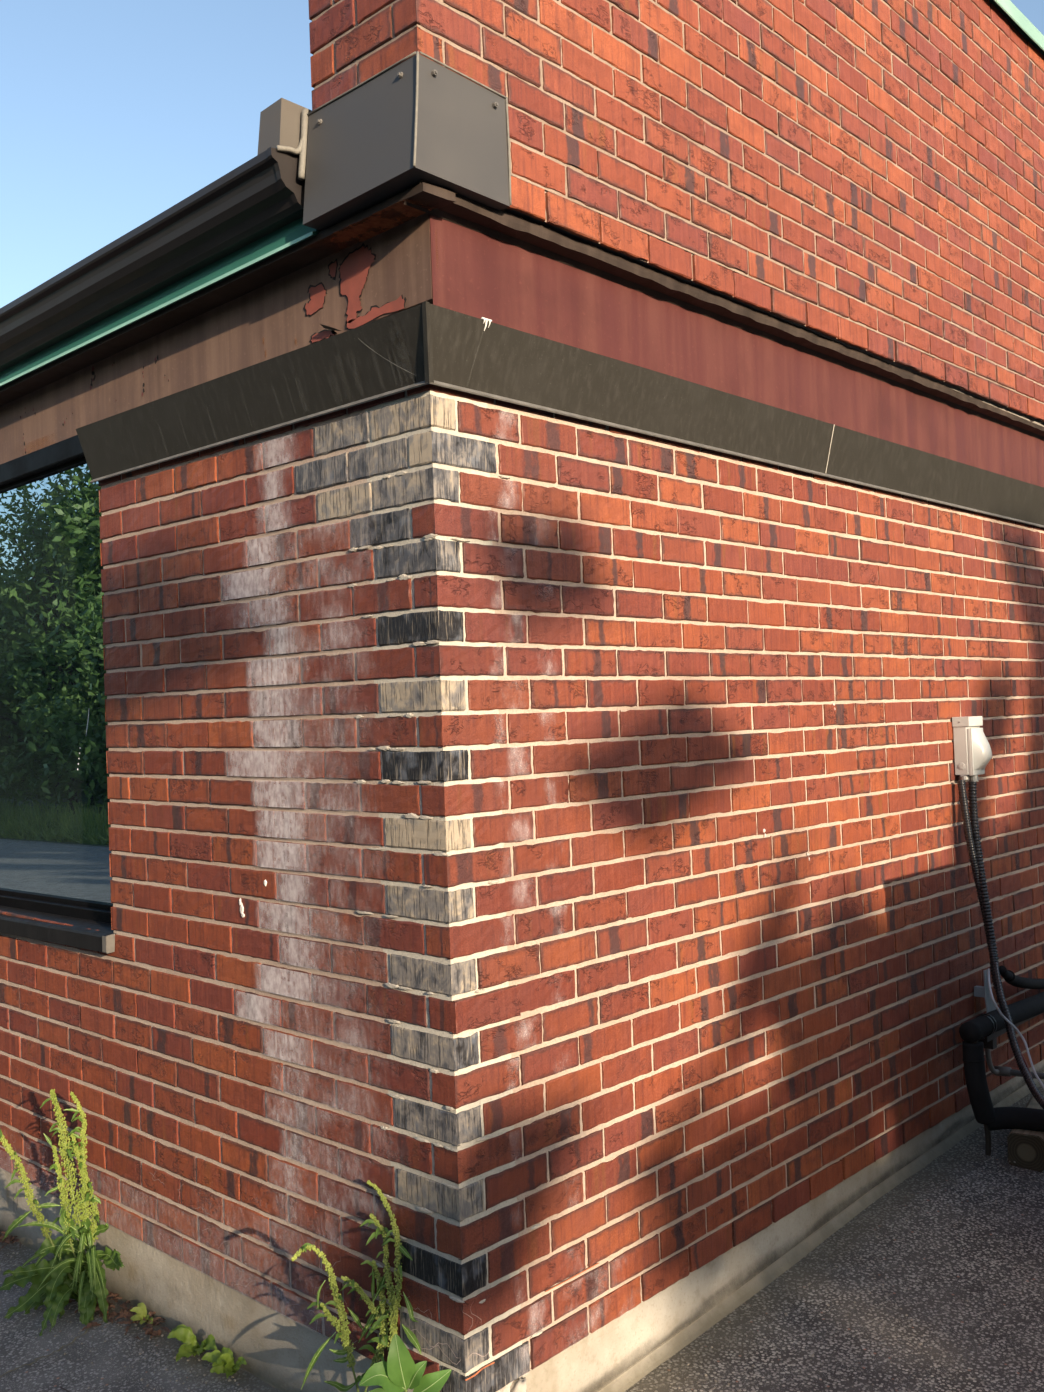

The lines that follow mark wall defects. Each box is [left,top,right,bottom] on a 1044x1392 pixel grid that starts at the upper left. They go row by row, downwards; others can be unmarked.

peeling [303,243,407,343]
water stain [229,442,311,1023]
water stain [269,1032,303,1065]